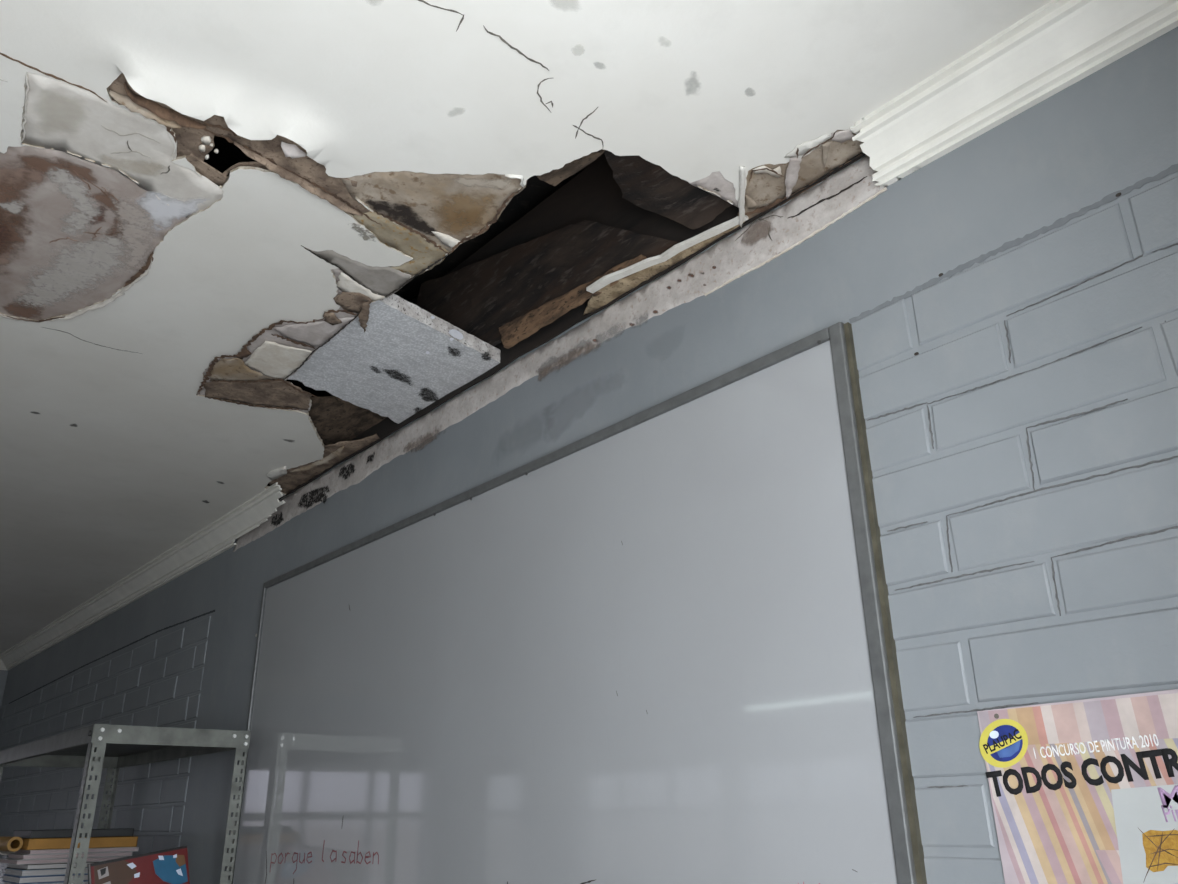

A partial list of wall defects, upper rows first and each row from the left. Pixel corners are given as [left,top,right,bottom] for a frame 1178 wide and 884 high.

crack [0,53,107,102]
peeling [0,72,223,323]
crack [418,0,603,146]
flaking render [233,155,887,552]